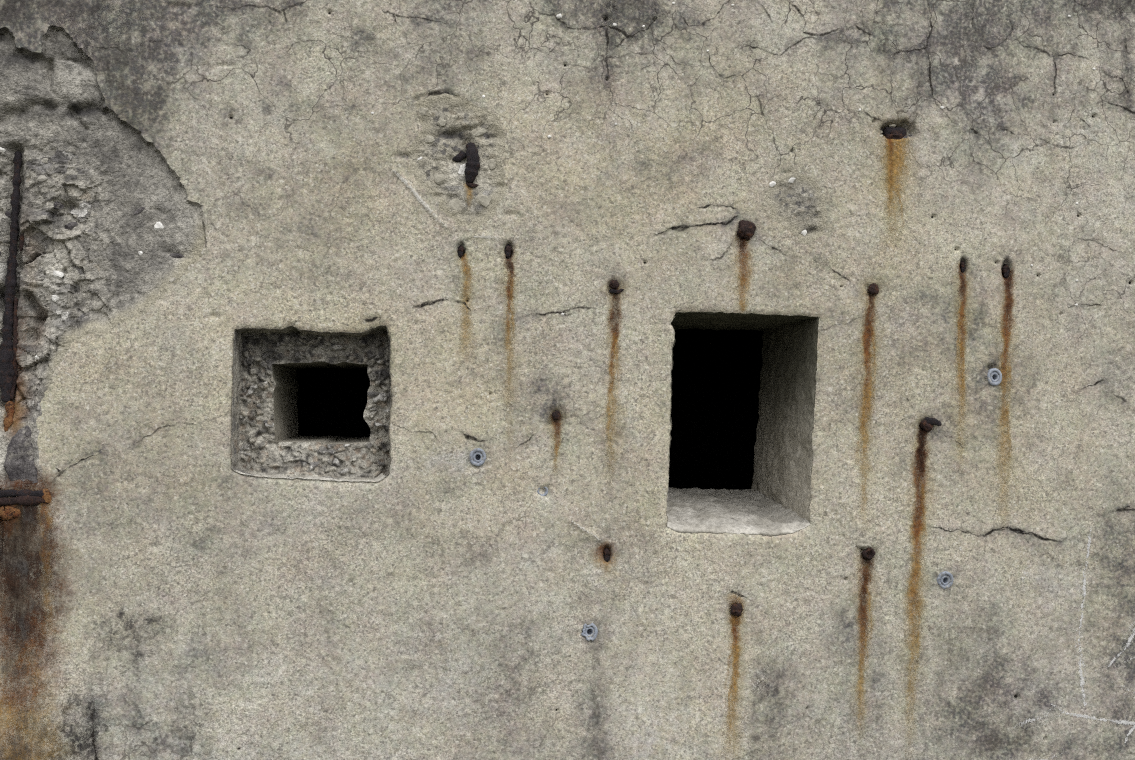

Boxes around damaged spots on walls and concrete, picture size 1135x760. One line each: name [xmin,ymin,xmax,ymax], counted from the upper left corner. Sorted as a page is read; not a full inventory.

crack [540,13,655,73]
crack [748,5,943,110]
crack [986,26,1083,89]
corrosion [0,151,25,432]
spalling [0,25,206,489]
spalling [405,93,509,231]
crack [658,204,736,234]
corrosion [860,294,875,448]
corrosion [1001,271,1013,386]
corrosion [907,426,928,654]
crack [934,527,1057,541]
corrosion [0,478,66,760]